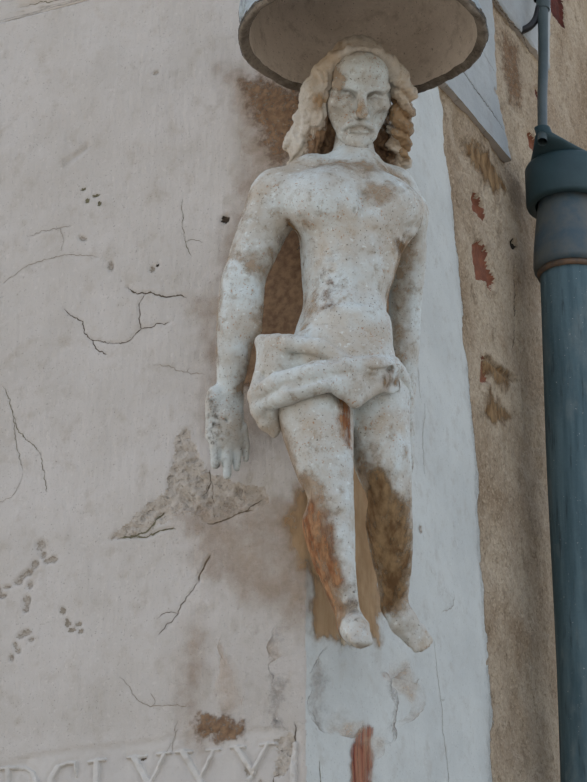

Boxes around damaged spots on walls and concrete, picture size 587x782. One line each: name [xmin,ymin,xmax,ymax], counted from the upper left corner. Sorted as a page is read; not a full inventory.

crack [5,226,91,282]
flaking render [472,241,495,291]
crack [64,288,184,354]
crack [4,388,47,499]
spalling [111,428,270,541]
crack [159,556,210,634]
rust [351,726,373,782]